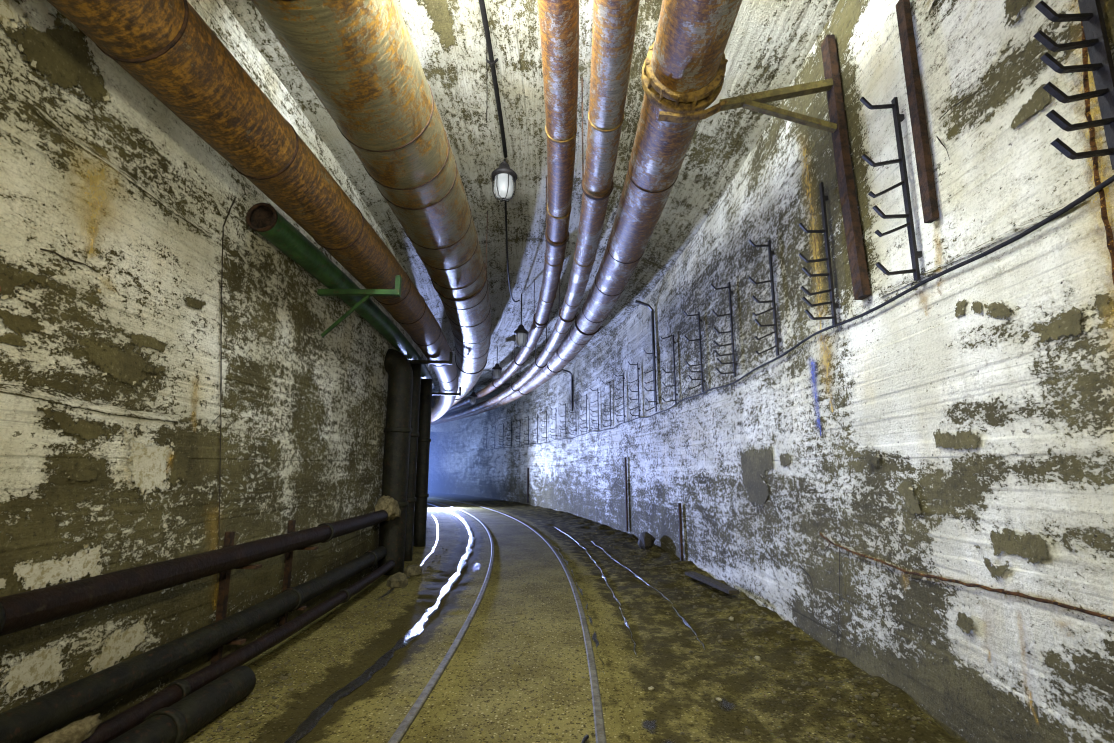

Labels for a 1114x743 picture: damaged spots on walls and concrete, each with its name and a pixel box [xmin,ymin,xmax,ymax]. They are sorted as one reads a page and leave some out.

peeling [1001,0,1032,30]
peeling [0,10,115,105]
peeling [1011,84,1050,129]
peeling [0,259,52,347]
peeling [955,299,1015,320]
peeling [1038,306,1083,344]
peeling [71,331,169,392]
peeling [37,406,112,442]
peeling [933,428,980,451]
peeling [738,444,791,509]
peeling [974,528,1049,581]
peeling [955,612,974,638]